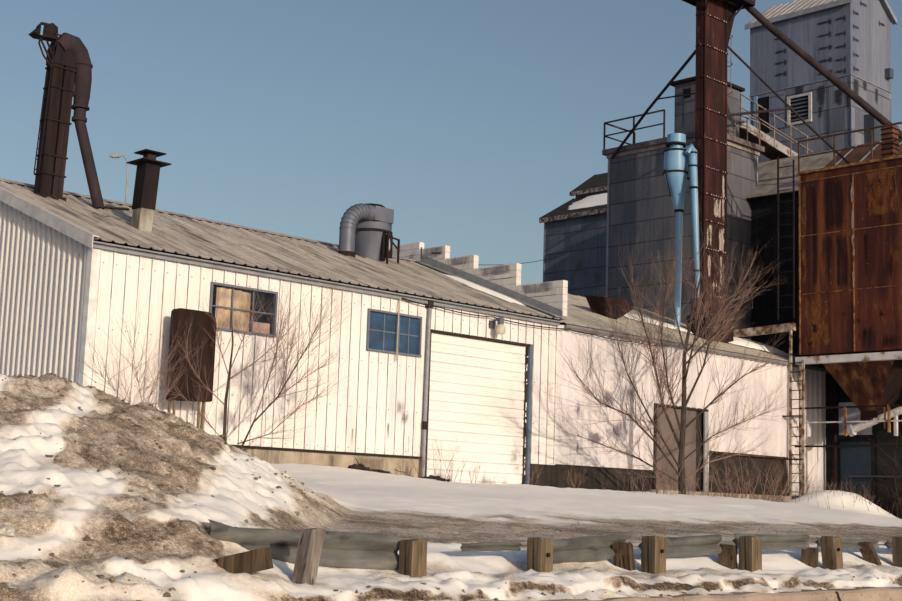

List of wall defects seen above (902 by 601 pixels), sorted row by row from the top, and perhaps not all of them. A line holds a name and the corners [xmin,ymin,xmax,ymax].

rust [801,173,849,286]